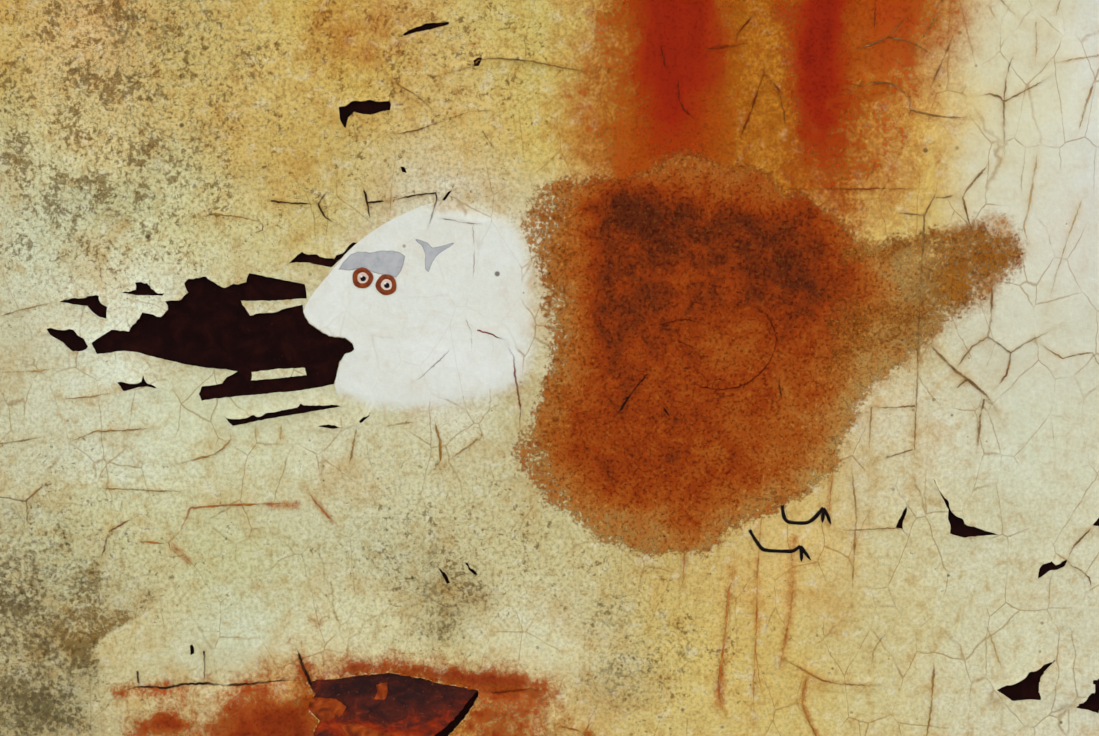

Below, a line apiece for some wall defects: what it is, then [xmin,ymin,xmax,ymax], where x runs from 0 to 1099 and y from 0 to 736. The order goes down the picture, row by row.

peeling [339,97,393,128]
crack [987,62,1039,120]
peeling [47,273,354,401]
corrosion [511,0,1023,557]
crack [831,164,1090,457]
peeling [227,404,339,426]
crack [830,451,899,578]
peeling [934,480,998,538]
crack [1072,530,1091,585]
corrosion [113,652,570,736]
crack [926,669,935,736]
peeling [997,660,1055,701]